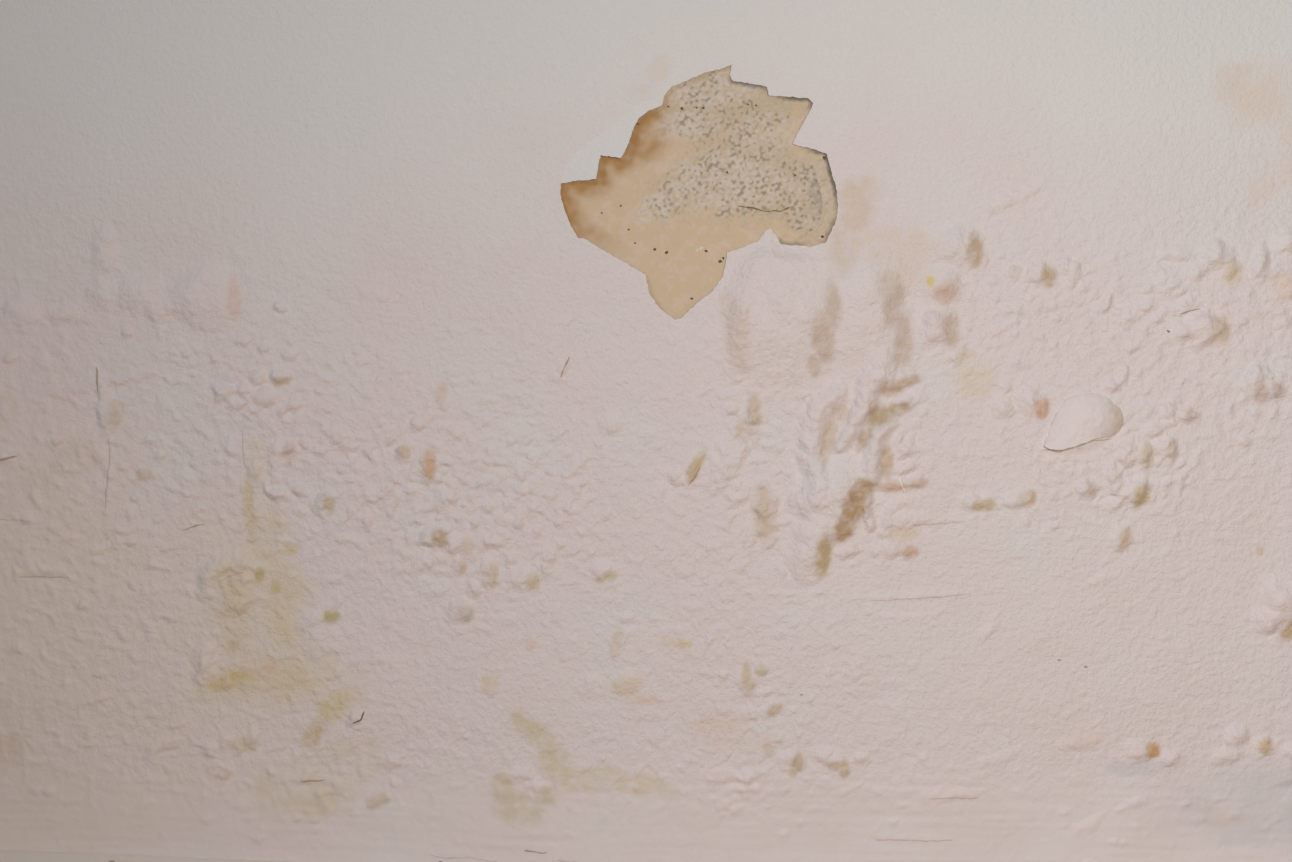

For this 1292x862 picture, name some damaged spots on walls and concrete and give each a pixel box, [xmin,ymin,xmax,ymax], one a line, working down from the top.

peeling [560,65,838,320]